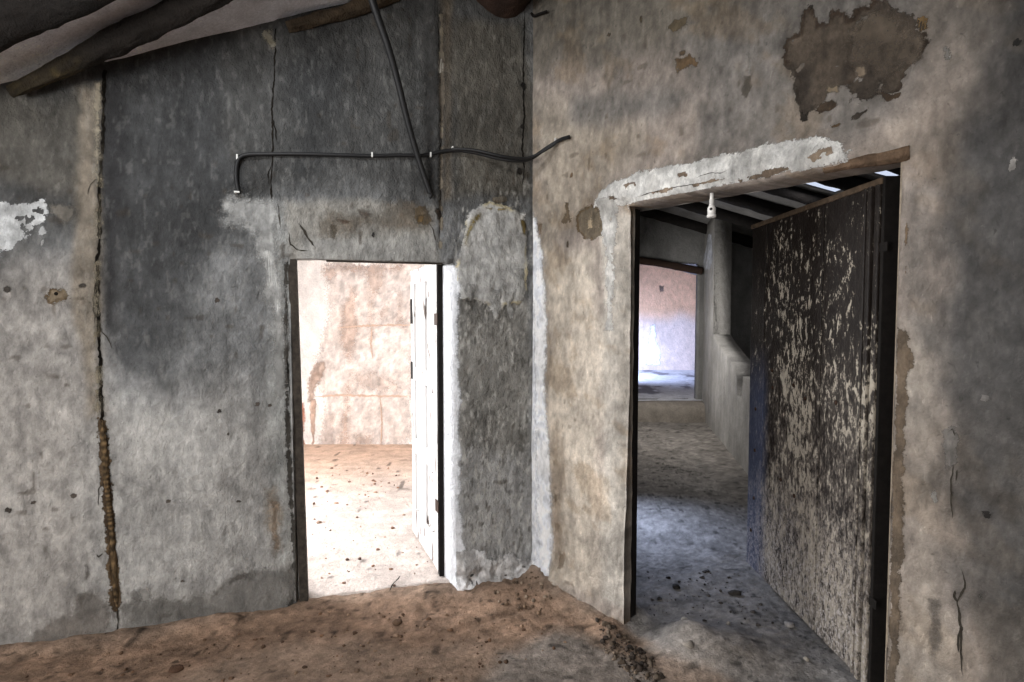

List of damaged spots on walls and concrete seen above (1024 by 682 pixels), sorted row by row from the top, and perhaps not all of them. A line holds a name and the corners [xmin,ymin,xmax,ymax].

peeling [675,50,698,73]
peeling [782,0,930,128]
crack [262,29,316,251]
peeling [807,147,833,162]
peeling [651,172,723,194]
peeling [738,167,789,183]
peeling [0,199,74,252]
spalling [561,202,603,241]
spalling [44,288,70,306]
crack [930,572,966,675]